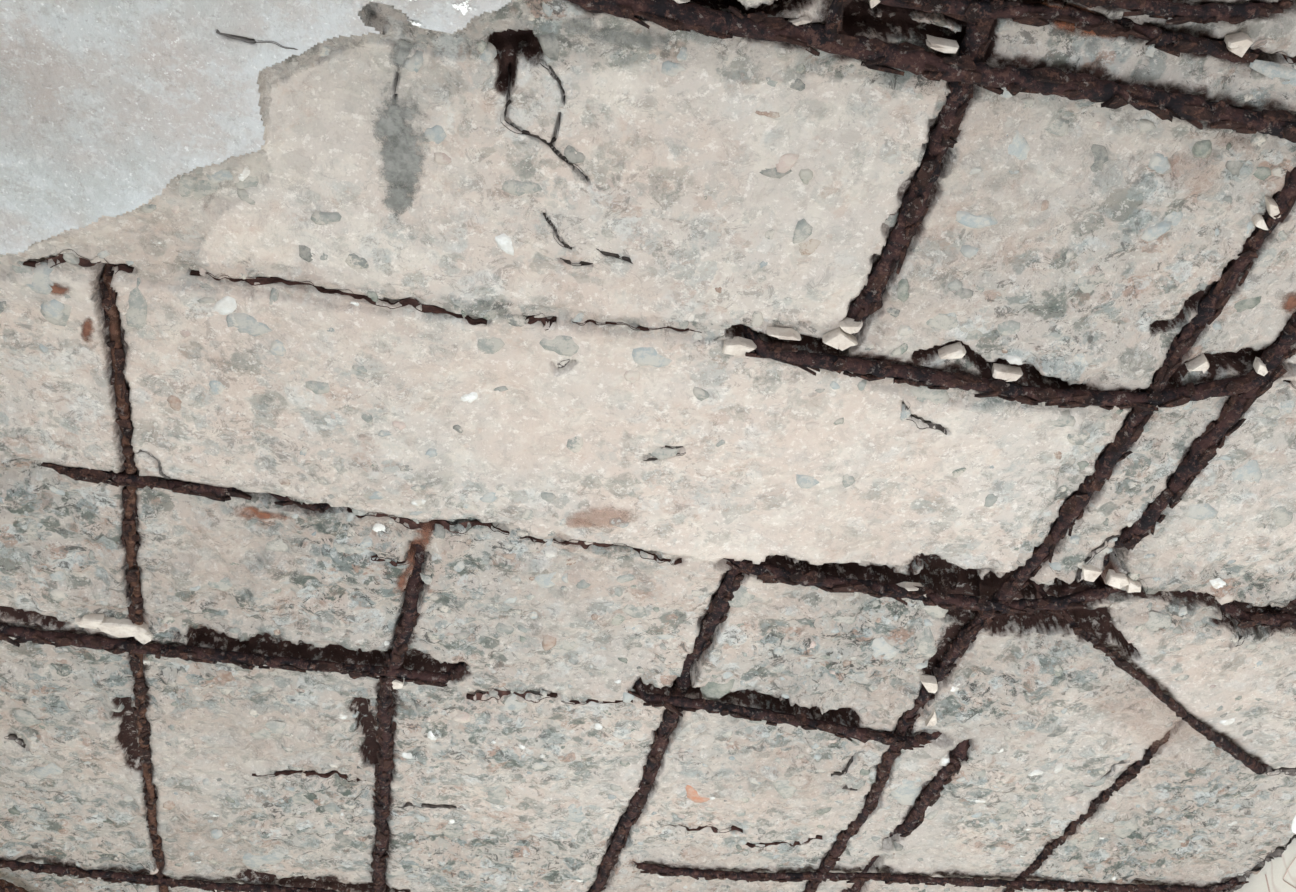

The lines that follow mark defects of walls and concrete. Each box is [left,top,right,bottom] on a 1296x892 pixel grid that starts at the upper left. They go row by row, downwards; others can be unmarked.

spalling [568,0,1296,143]
spalling [845,81,974,323]
rust [50,283,69,295]
rust [81,319,92,342]
spalling [1142,167,1296,393]
rust [1283,293,1296,312]
spalling [40,462,252,502]
rust [240,507,287,520]
rust [396,523,432,593]
spalling [736,202,1296,775]
spalling [0,623,465,892]
spalling [588,558,1296,892]